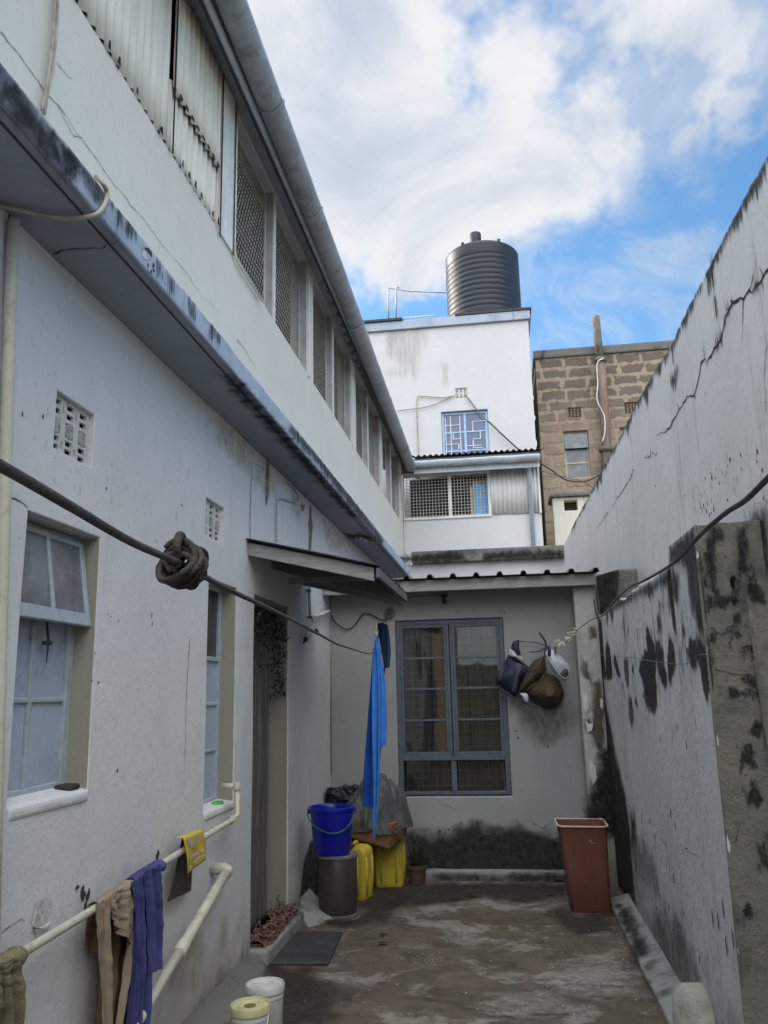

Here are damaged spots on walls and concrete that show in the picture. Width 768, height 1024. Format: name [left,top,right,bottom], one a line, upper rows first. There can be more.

leakage [0,63,137,238]
crack [0,31,217,312]
crack [596,263,768,529]
leakage [596,510,768,664]
leakage [728,675,759,699]
leakage [324,822,567,926]